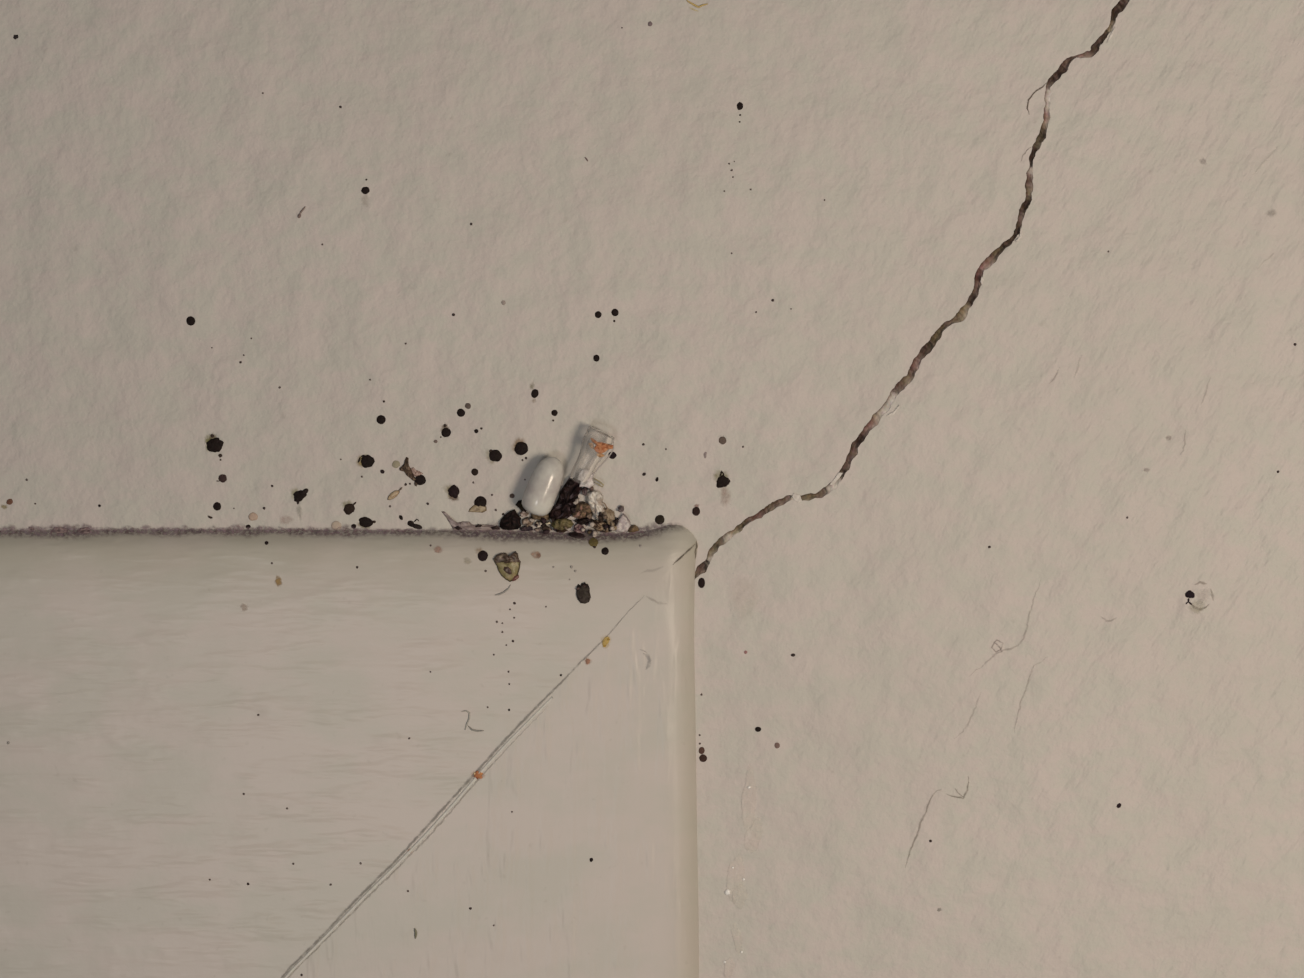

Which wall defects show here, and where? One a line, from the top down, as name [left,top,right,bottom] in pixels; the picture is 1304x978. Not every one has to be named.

crack [695,0,1129,579]